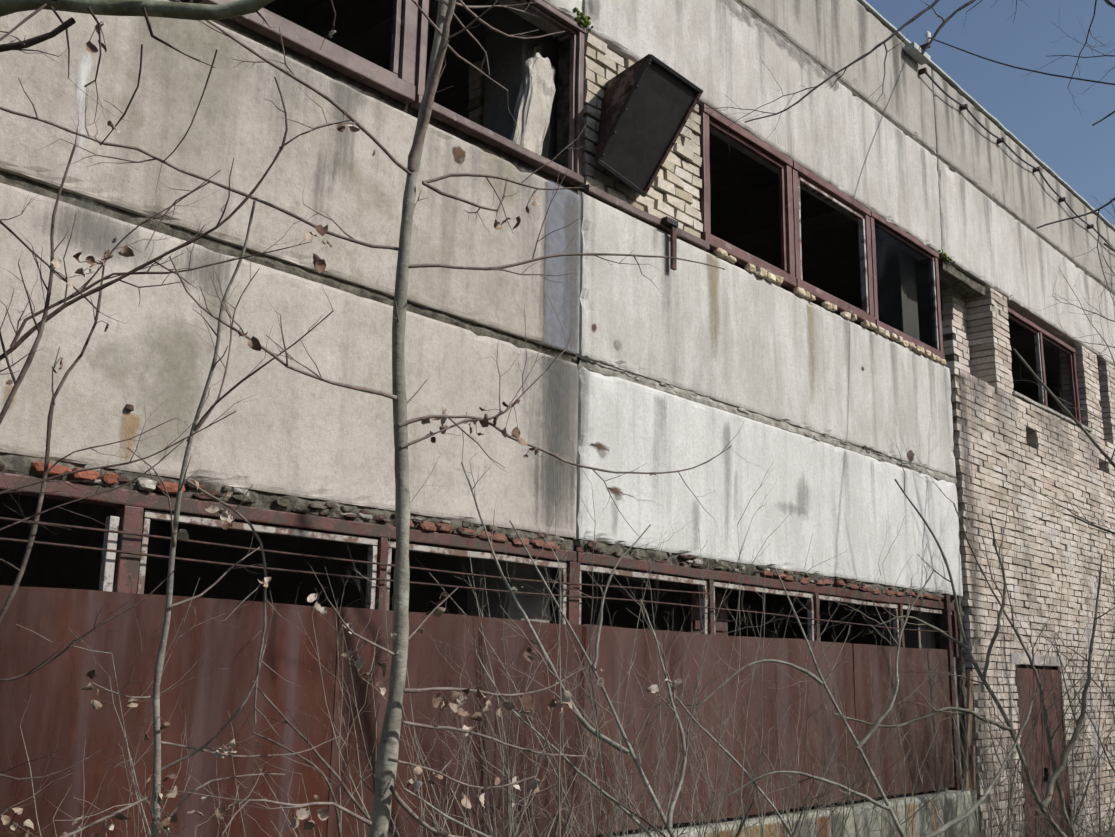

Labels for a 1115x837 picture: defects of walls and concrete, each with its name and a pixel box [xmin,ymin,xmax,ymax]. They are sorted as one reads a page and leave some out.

damp [537,181,584,500]
corrosion [123,404,140,452]
spalling [0,453,396,527]
spalling [410,514,955,604]